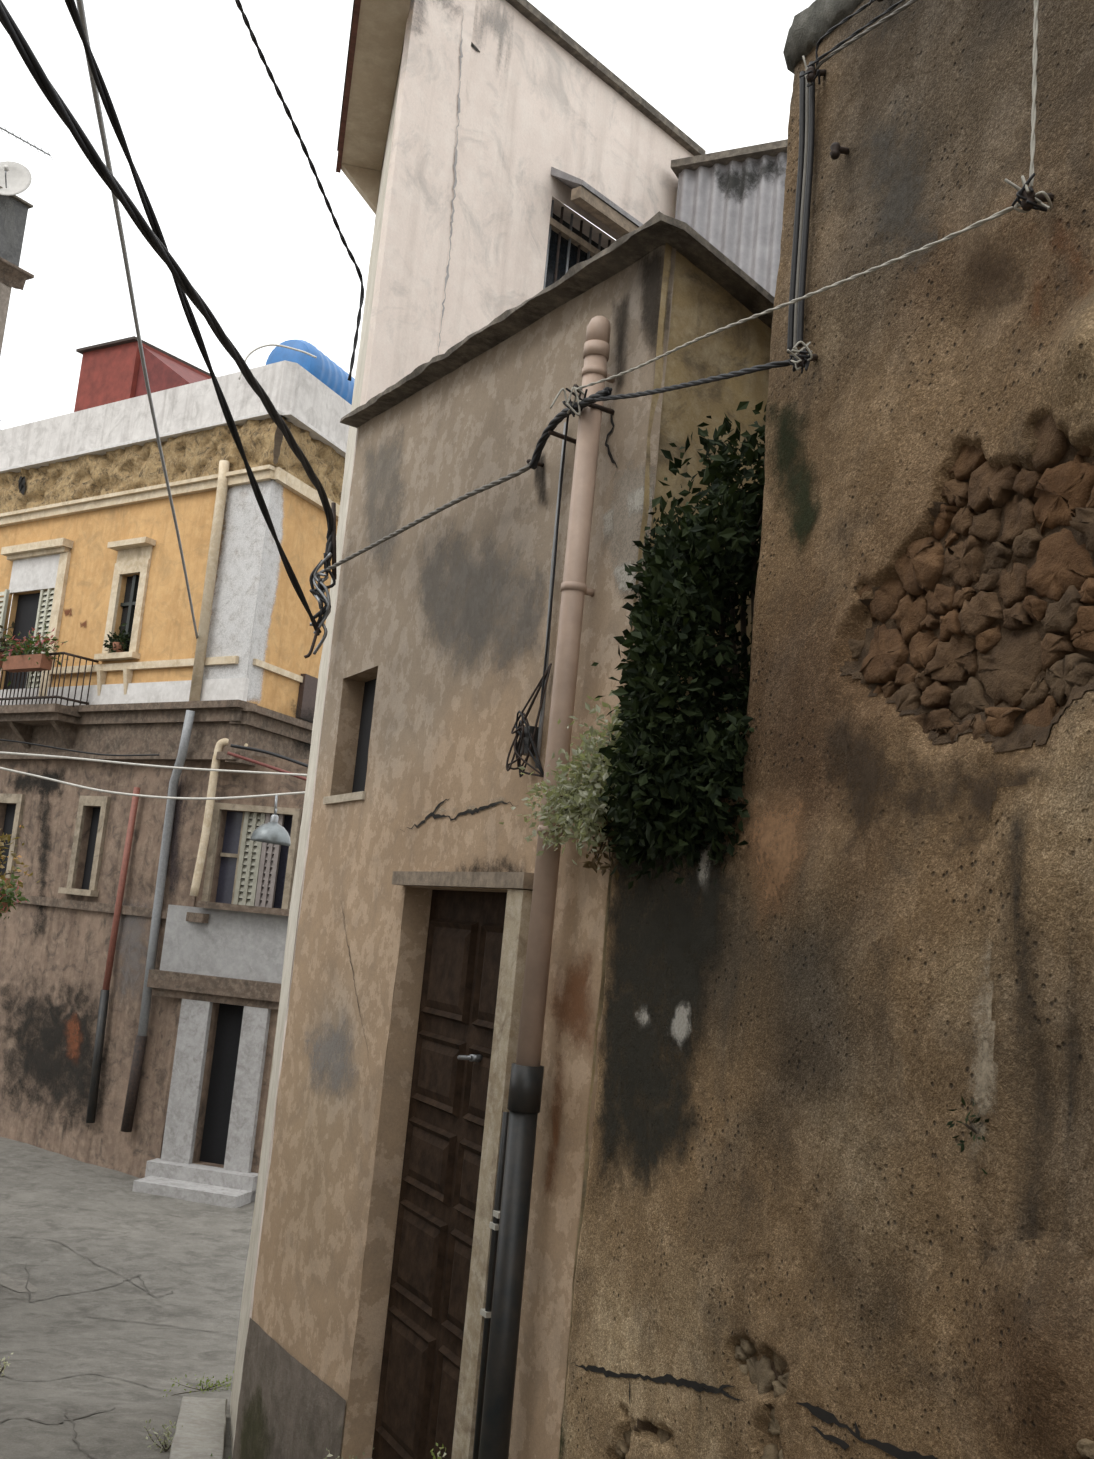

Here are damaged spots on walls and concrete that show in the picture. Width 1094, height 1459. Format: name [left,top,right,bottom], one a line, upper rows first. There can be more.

spalling [839,414,1094,752]
crack [400,798,518,832]
damp [2,981,106,1128]
damp [599,830,733,1188]
damp [974,994,995,1108]
spalling [615,1418,671,1459]
crack [571,1362,744,1402]
spalling [735,1338,789,1459]
crack [796,1402,937,1459]
spalling [1076,1438,1094,1459]